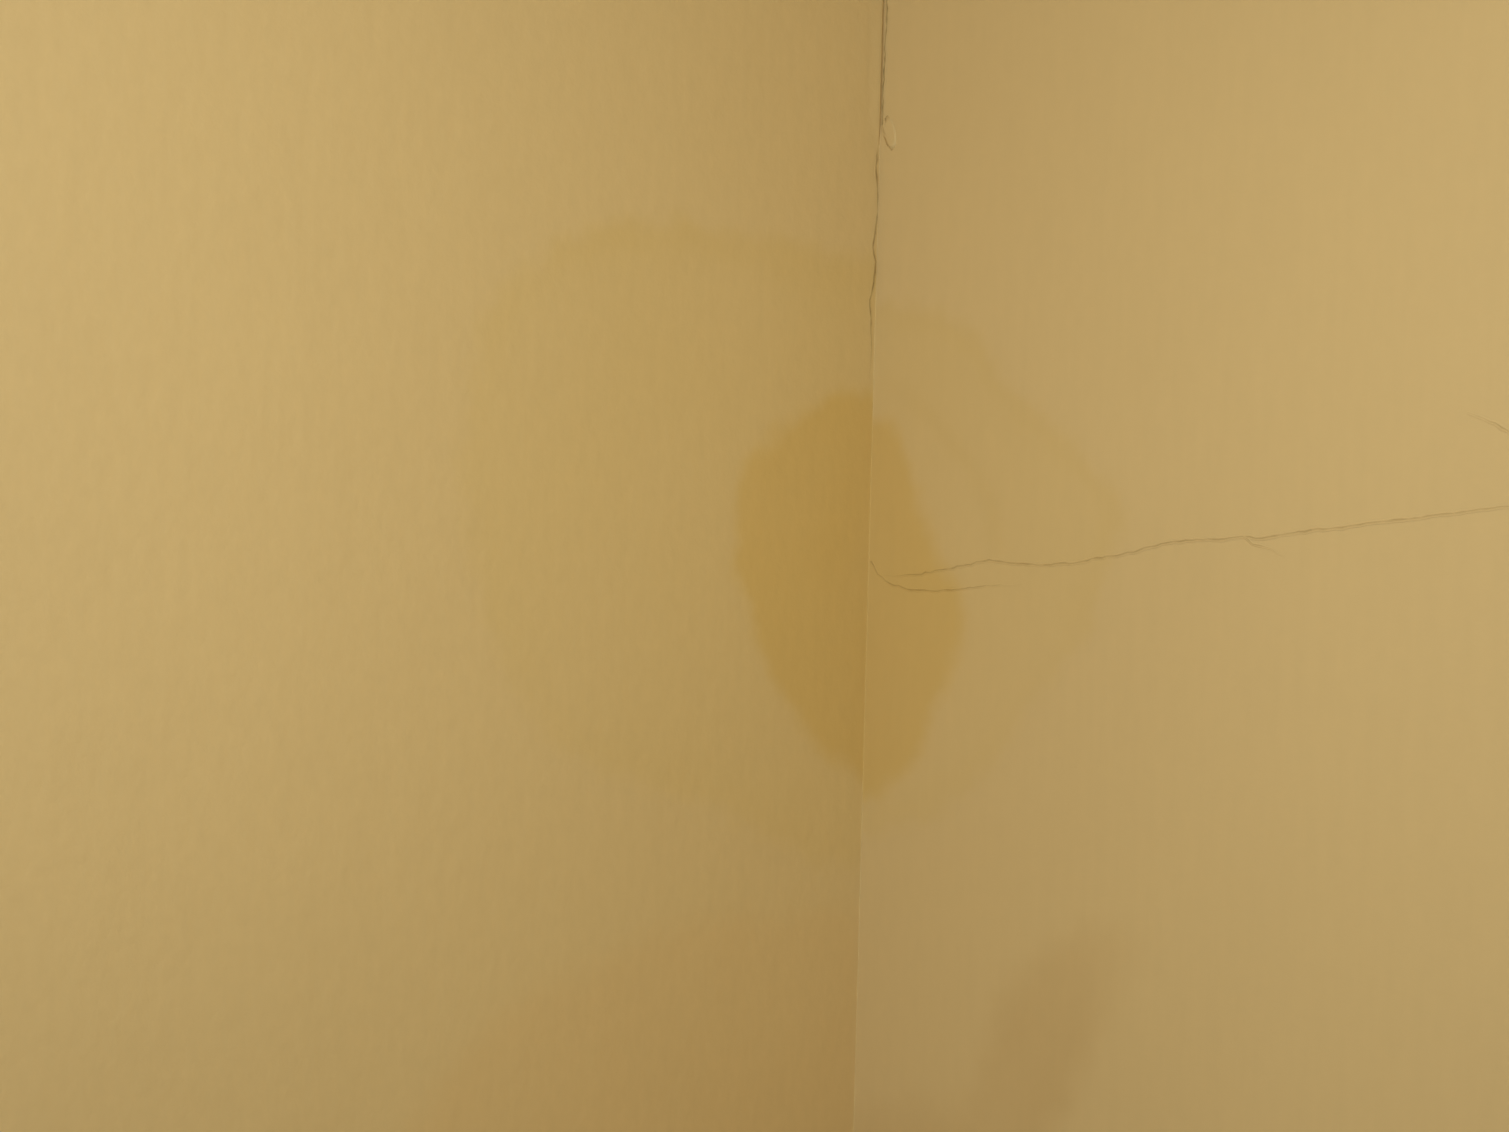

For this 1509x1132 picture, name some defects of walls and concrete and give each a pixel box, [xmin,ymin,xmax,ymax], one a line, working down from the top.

water stain [387,200,1164,1132]
crack [870,504,1509,593]